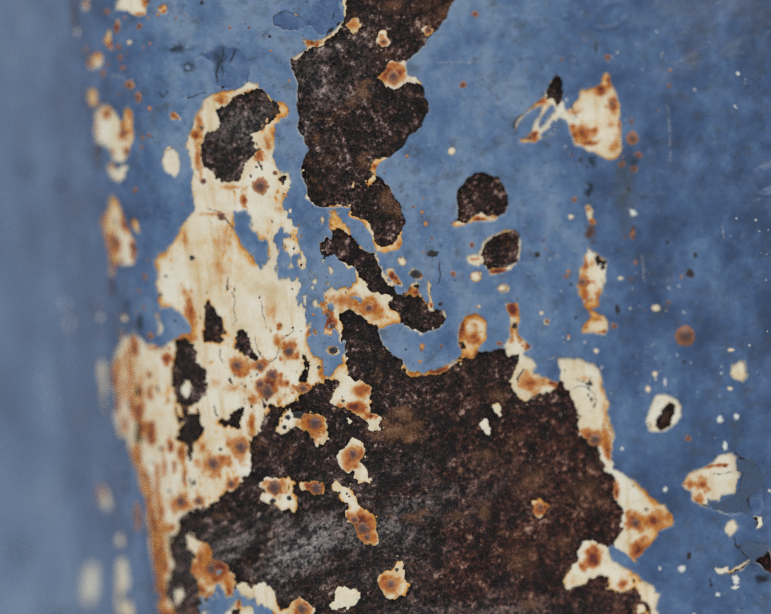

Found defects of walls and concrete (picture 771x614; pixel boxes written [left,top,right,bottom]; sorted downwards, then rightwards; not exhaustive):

peeling [88,52,103,69]
peeling [88,88,134,182]
peeling [99,0,674,614]
corrosion [669,325,695,346]
peeling [646,394,682,431]
peeling [682,453,765,536]